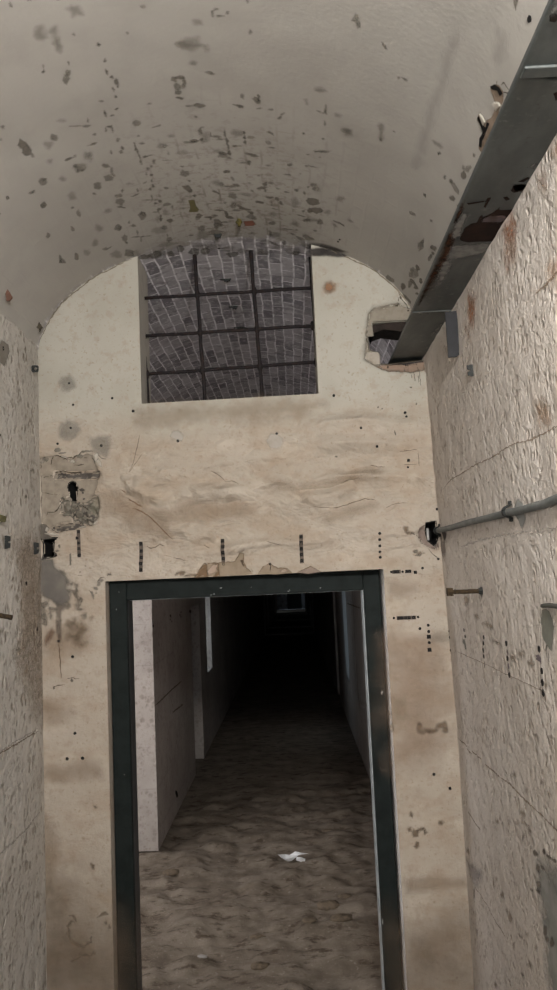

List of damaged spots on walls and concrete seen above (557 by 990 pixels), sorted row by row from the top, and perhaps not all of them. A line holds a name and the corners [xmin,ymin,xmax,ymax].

flaking render [439,82,509,282]
corrosion [419,177,529,305]
spalling [365,240,436,373]
flaking render [31,448,104,560]
crack [444,423,557,488]
peeling [66,574,110,617]
peeling [176,553,320,578]
crack [458,738,557,831]